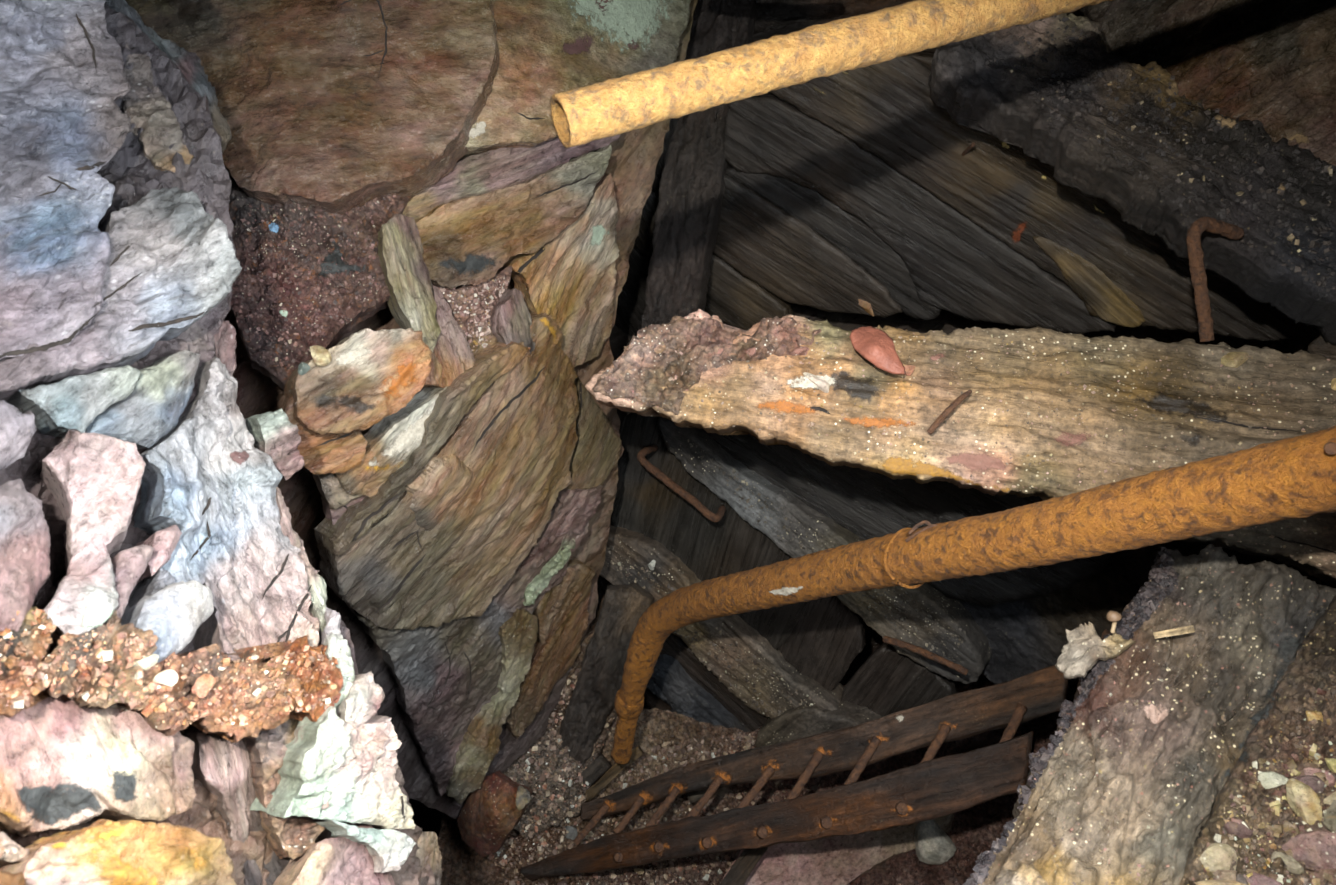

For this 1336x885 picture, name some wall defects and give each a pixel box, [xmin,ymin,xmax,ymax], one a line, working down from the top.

rust [758,400,815,414]
rust [844,417,916,428]